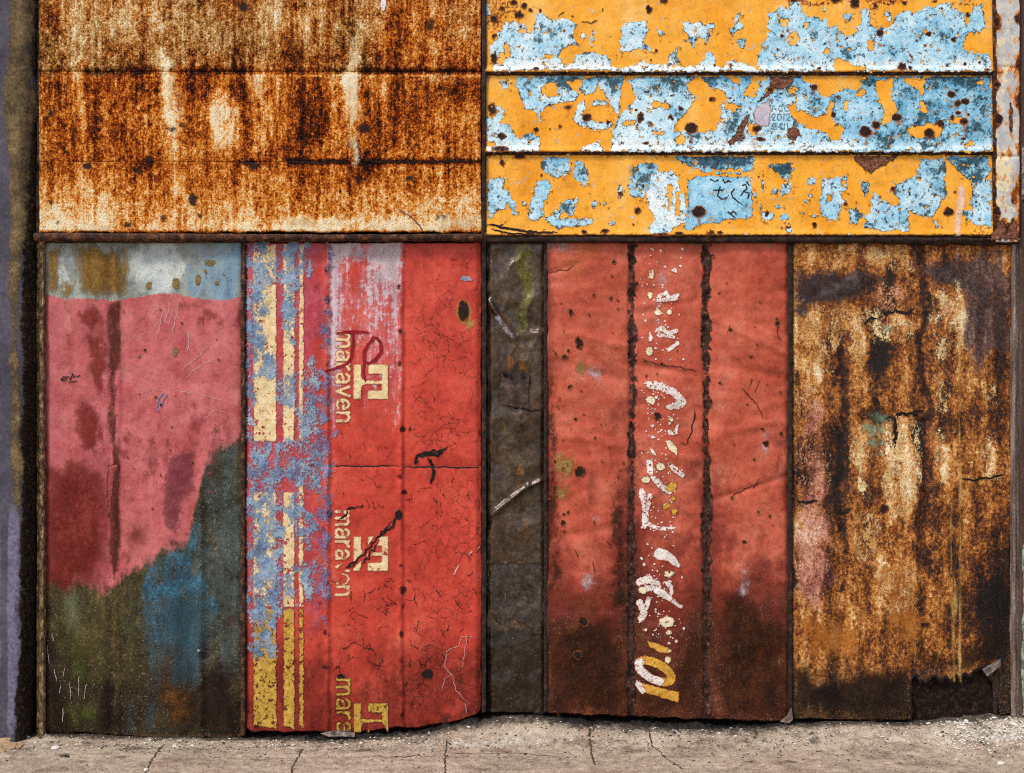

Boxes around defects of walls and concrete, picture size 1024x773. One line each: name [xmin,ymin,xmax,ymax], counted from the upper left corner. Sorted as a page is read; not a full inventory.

peeling [486,0,1015,236]
corrosion [48,243,128,298]
peeling [245,242,364,663]
crack [311,322,479,545]
corrosion [793,244,920,653]
corrosion [880,411,922,515]
crack [886,410,923,448]
crack [961,474,1005,482]
spalling [345,518,396,569]
leakage [612,505,624,605]
leakage [643,652,698,710]
leakage [719,592,909,722]